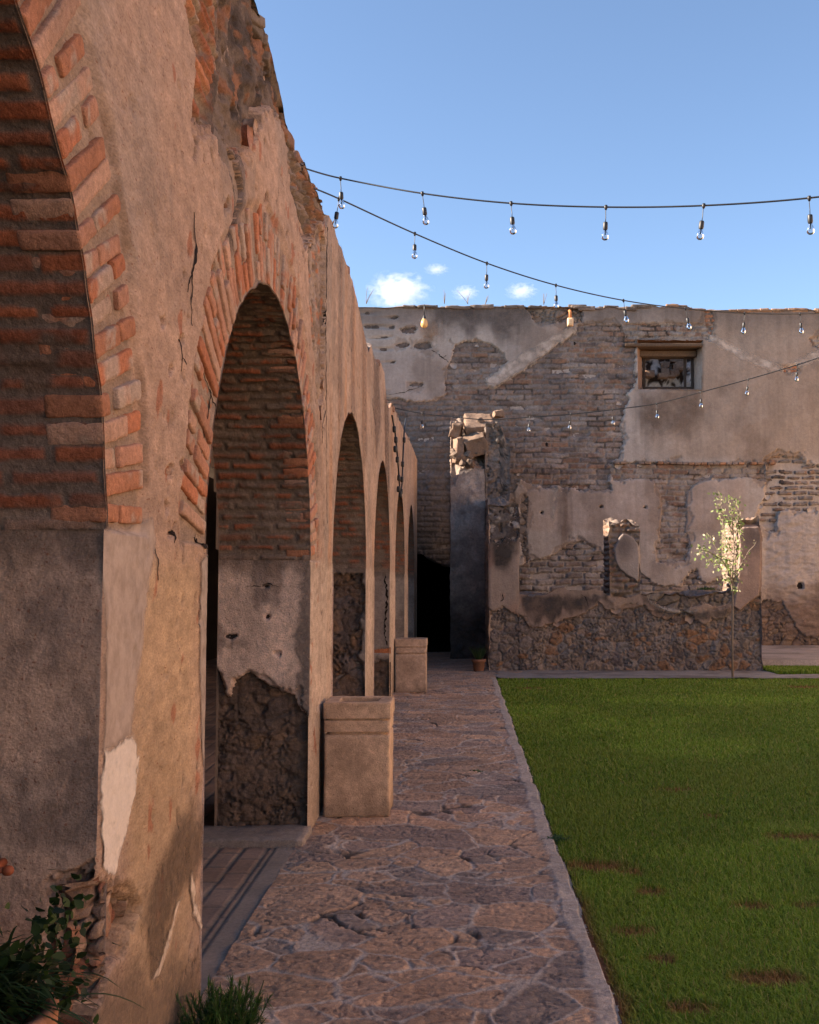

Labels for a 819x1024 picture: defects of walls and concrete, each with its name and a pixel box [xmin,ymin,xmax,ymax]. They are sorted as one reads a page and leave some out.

crack [178,213,218,451]
spalling [184,0,325,420]
spalling [386,308,819,671]
spalling [217,672,308,826]